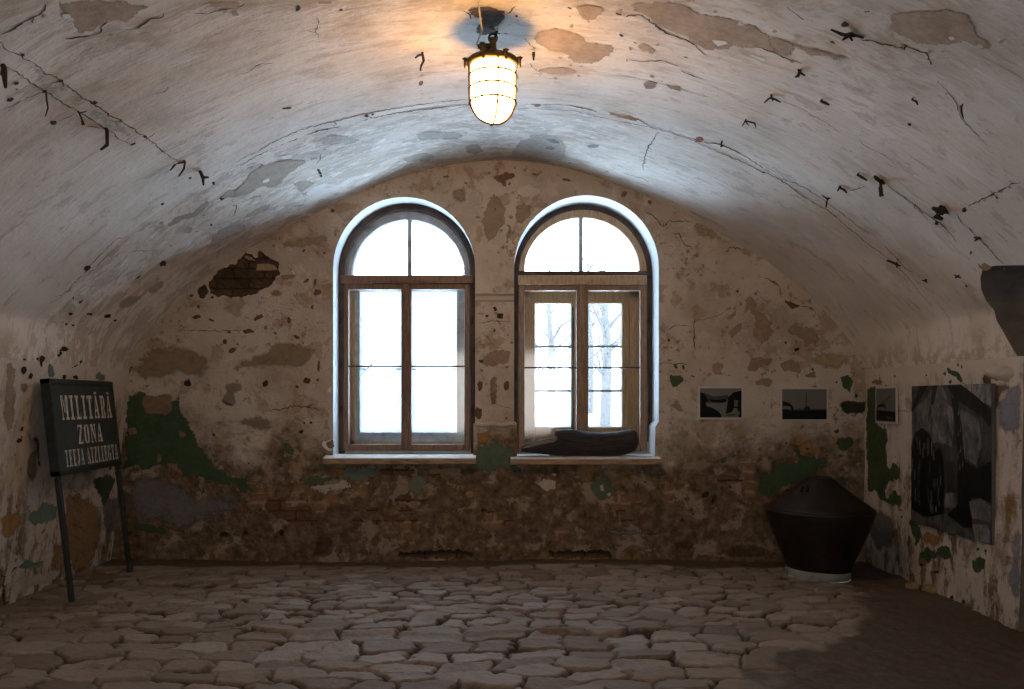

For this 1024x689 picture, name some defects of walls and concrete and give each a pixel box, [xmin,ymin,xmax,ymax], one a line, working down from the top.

crack [0,5,179,162]
peeling [534,5,614,80]
peeling [616,0,845,63]
peeling [889,9,1006,54]
peeling [160,135,366,247]
crack [521,101,1021,299]
flaking render [189,229,327,322]
flaking render [223,314,263,353]
peeling [725,290,819,388]
peeling [93,379,251,537]
peeling [757,373,952,574]